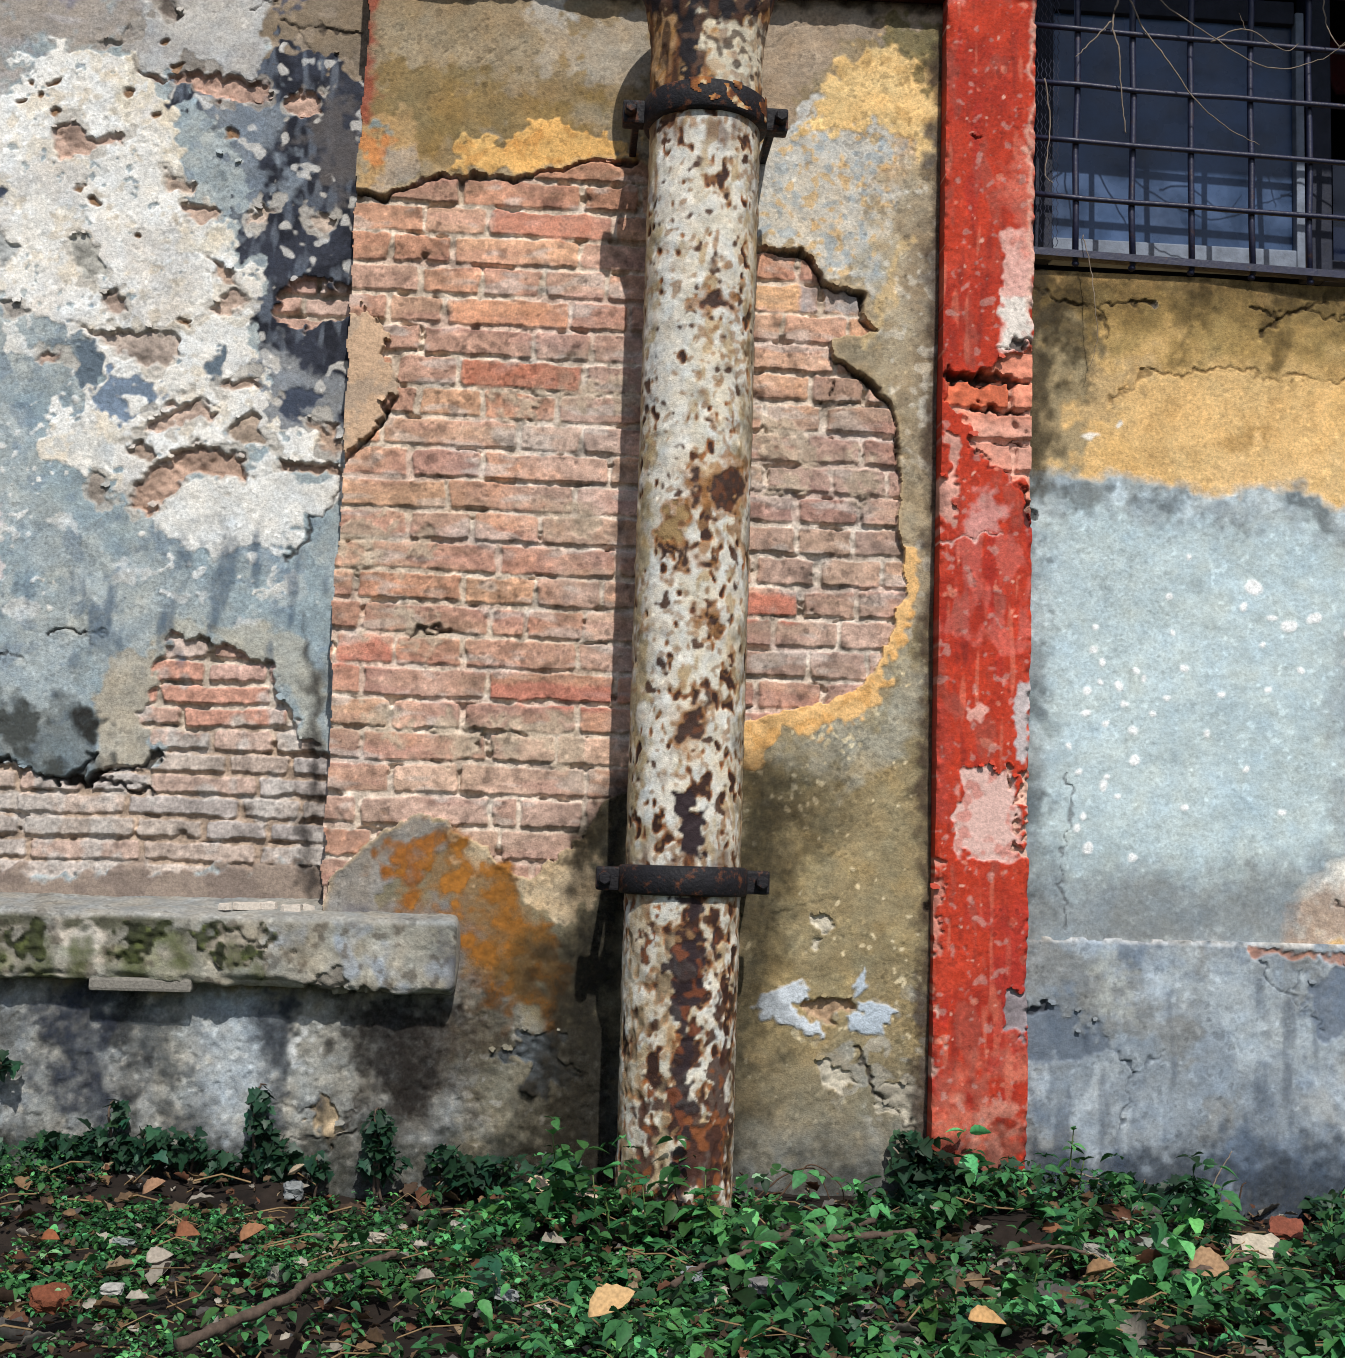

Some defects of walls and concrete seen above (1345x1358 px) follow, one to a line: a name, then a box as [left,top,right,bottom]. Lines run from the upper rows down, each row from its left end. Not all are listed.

crack [1098,298,1158,329]
crack [1249,304,1345,322]
flaking render [0,22,649,912]
corrosion [655,465,746,569]
flaking render [745,244,909,721]
flaking render [939,346,1032,527]
corrosion [672,788,709,859]
peeling [951,760,1029,863]
damp [0,987,266,1187]
damp [256,999,295,1071]
corrosion [625,925,735,1213]
crack [1026,999,1049,1016]